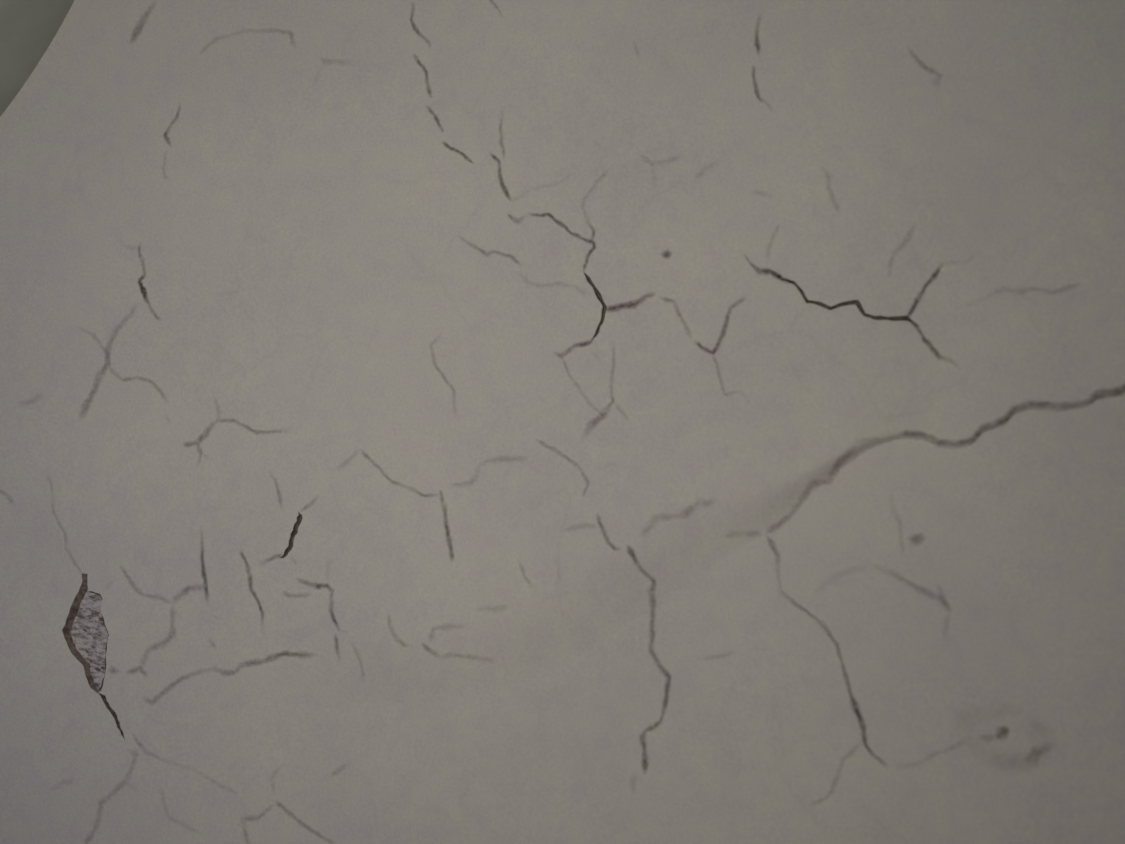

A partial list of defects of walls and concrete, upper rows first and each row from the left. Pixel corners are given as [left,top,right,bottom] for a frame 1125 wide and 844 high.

crack [580,241,638,345]
crack [763,270,938,355]
crack [281,512,302,558]
spalling [62,573,109,693]
crack [99,693,125,739]